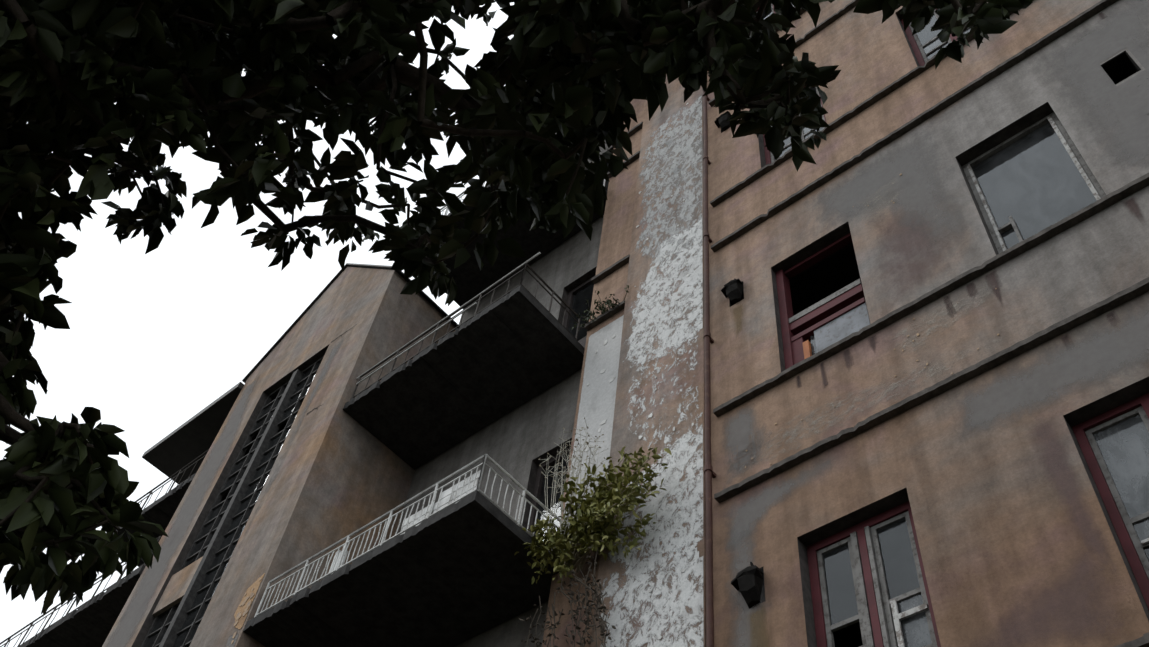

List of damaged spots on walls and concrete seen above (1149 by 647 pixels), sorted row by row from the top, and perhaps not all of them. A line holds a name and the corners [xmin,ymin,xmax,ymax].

spalling [226,573,265,647]
peeling [563,96,704,647]